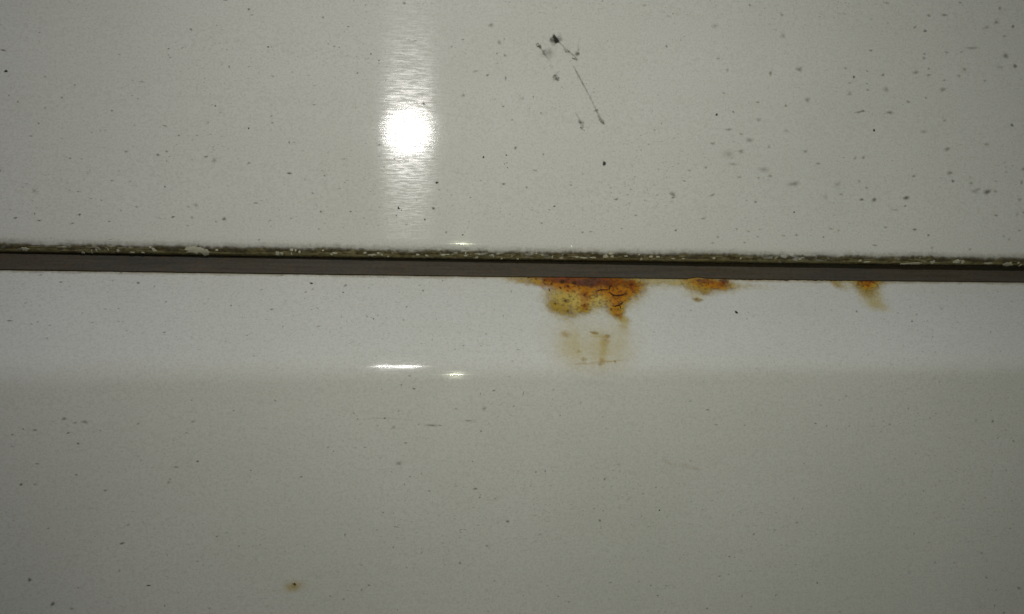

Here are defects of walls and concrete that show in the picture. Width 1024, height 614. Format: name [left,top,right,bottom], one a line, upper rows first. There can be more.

rust [515,277,646,322]
rust [666,277,735,301]
rust [853,280,882,305]